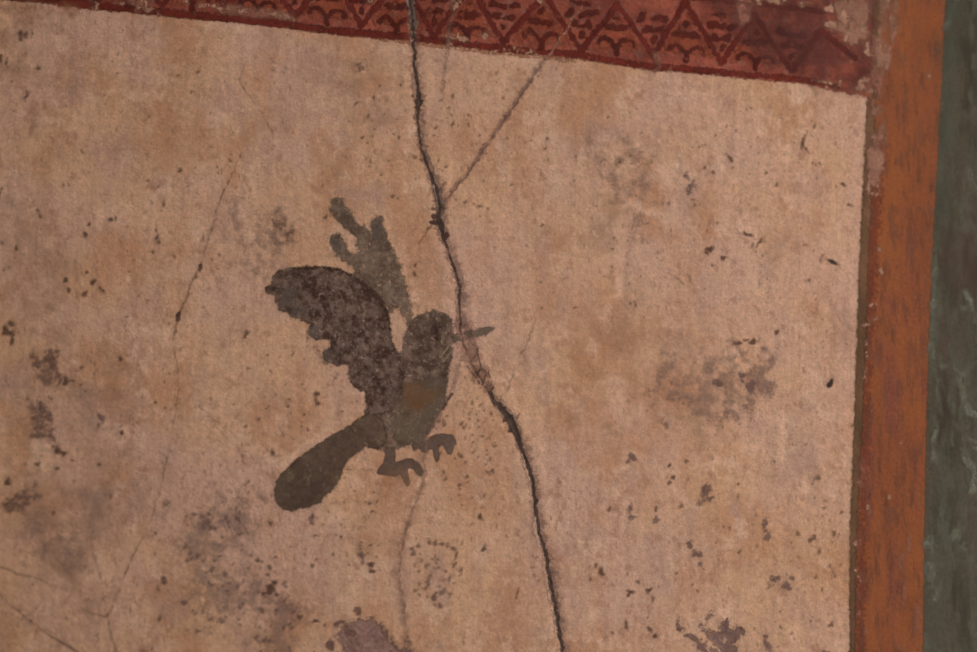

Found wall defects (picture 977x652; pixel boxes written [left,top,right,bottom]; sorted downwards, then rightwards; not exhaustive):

peeling [738,0,787,23]
peeling [824,0,899,116]
peeling [865,126,887,196]
crack [406,0,583,652]